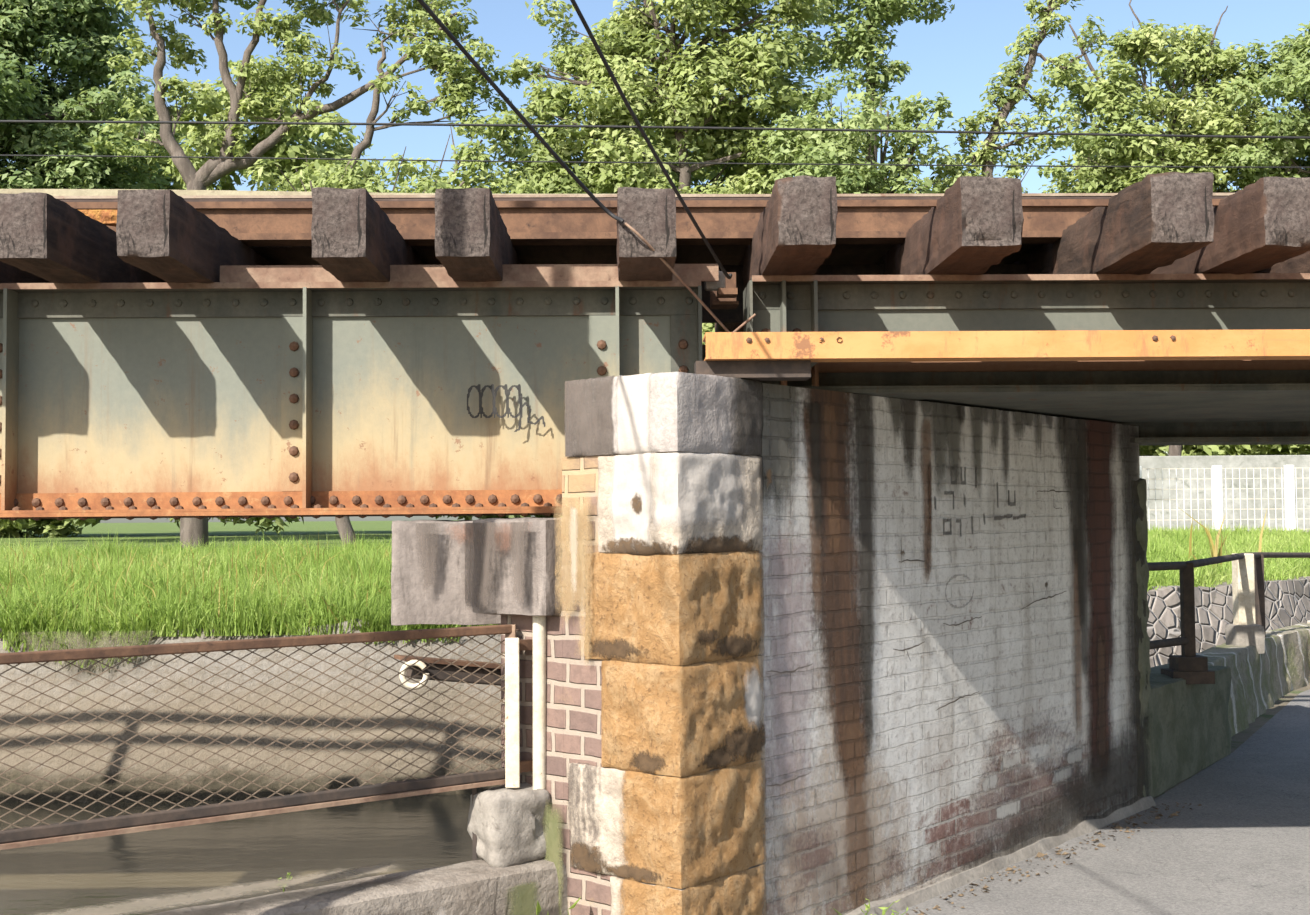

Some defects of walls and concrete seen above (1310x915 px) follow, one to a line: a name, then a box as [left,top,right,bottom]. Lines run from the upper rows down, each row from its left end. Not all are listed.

damp [416,523,438,587]
damp [464,522,528,607]
damp [808,403,821,531]
damp [854,393,875,747]
damp [889,397,1087,672]
damp [964,424,1149,871]
corrosion [1074,420,1117,773]
peeling [921,724,1088,888]